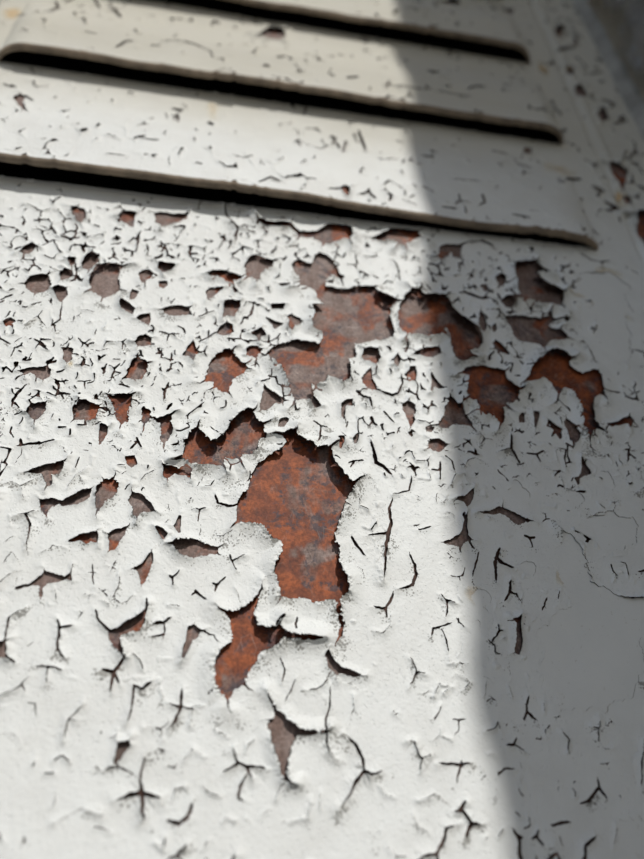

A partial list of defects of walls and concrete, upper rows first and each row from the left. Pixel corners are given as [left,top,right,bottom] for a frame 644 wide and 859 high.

peeling [244,21,297,47]
peeling [2,89,42,117]
peeling [61,198,94,230]
crack [0,0,644,318]
peeling [331,179,358,202]
peeling [591,154,644,269]
peeling [0,204,643,807]
crack [0,179,644,859]